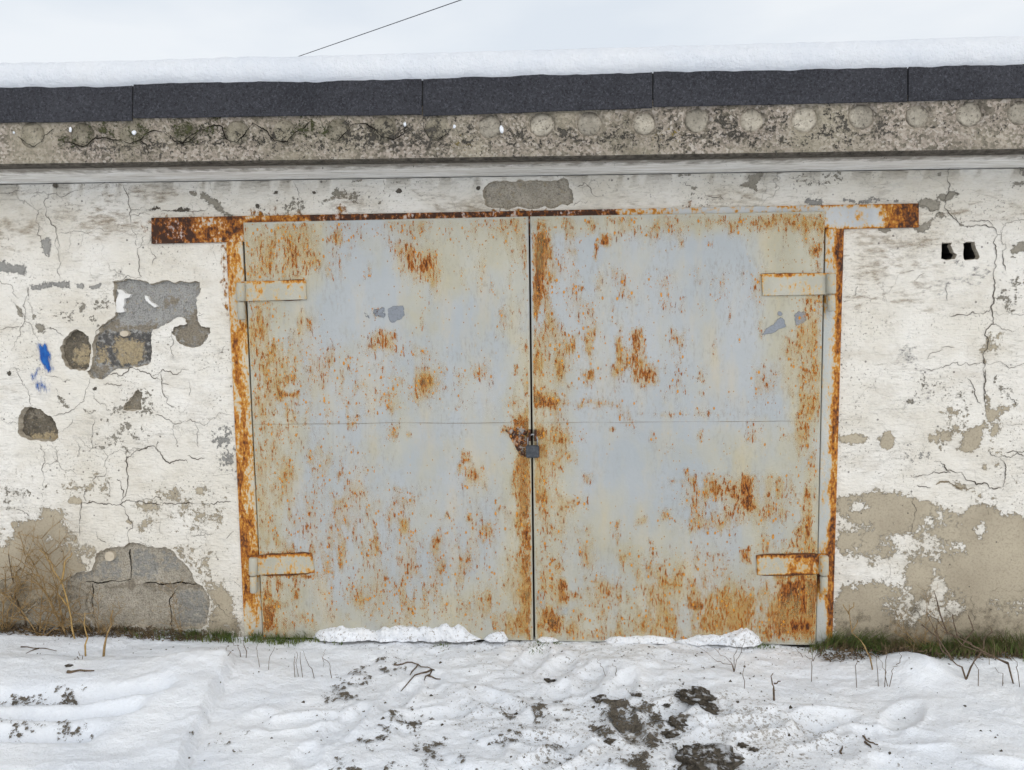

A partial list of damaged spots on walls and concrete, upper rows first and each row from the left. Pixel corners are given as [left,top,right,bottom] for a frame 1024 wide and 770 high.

crack [6,183,204,280]
spalling [476,175,574,210]
crack [0,281,61,423]
spalling [18,406,58,442]
spalling [0,260,210,392]
crack [41,331,231,617]
rust [244,201,825,643]
peeling [838,371,1018,471]
crack [911,169,1024,533]
spalling [0,471,244,637]
peeling [833,480,1024,647]